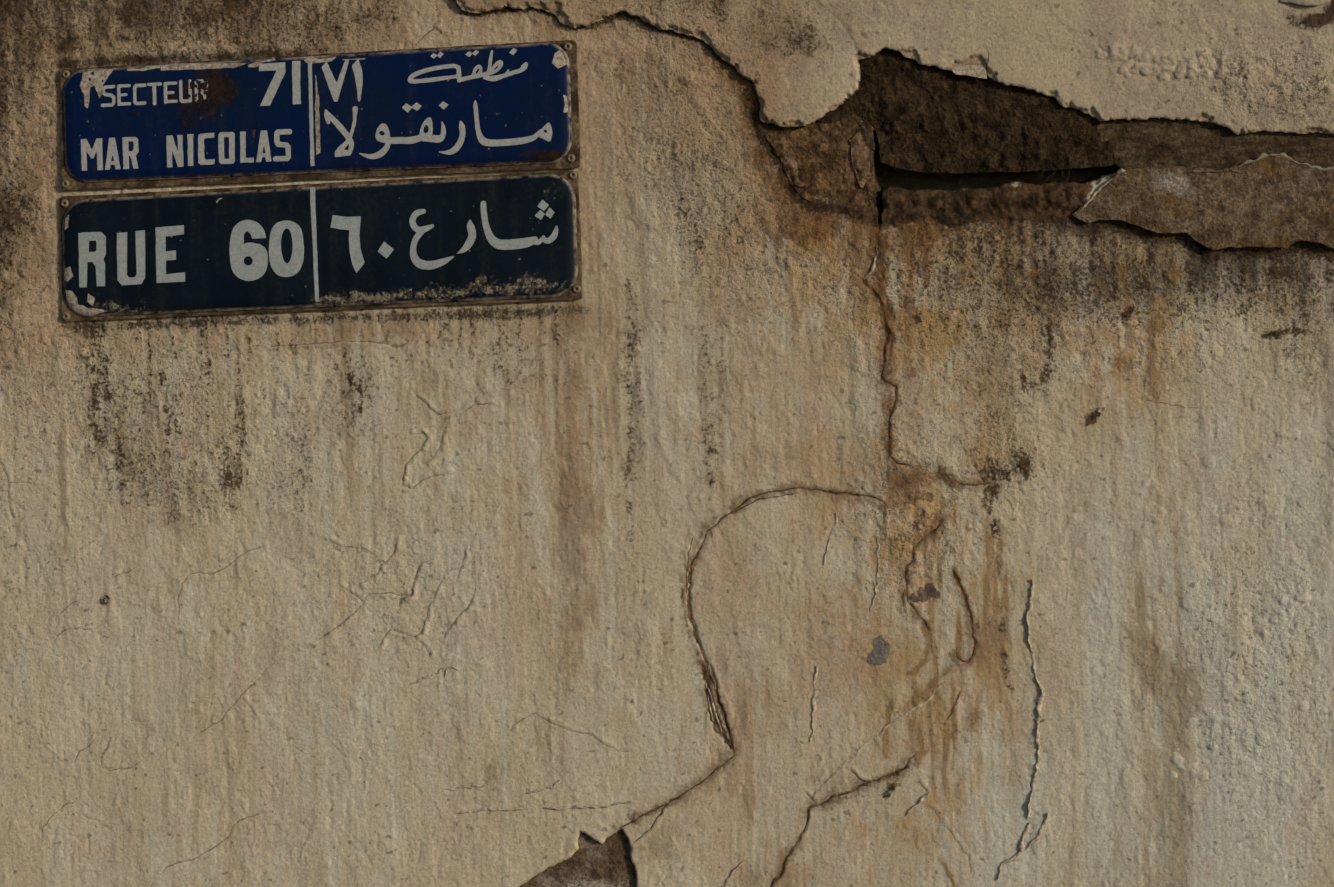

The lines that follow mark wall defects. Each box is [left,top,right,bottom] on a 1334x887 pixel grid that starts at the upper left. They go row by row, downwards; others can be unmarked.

damp [84,0,346,65]
spalling [746,48,1334,250]
damp [0,181,37,299]
damp [1083,221,1334,313]
damp [1020,268,1078,392]
damp [1271,327,1305,339]
damp [77,313,264,510]
damp [977,448,1033,537]
crack [620,487,885,843]
corrosion [908,623,934,675]
spalling [520,830,637,887]
crack [770,754,916,887]